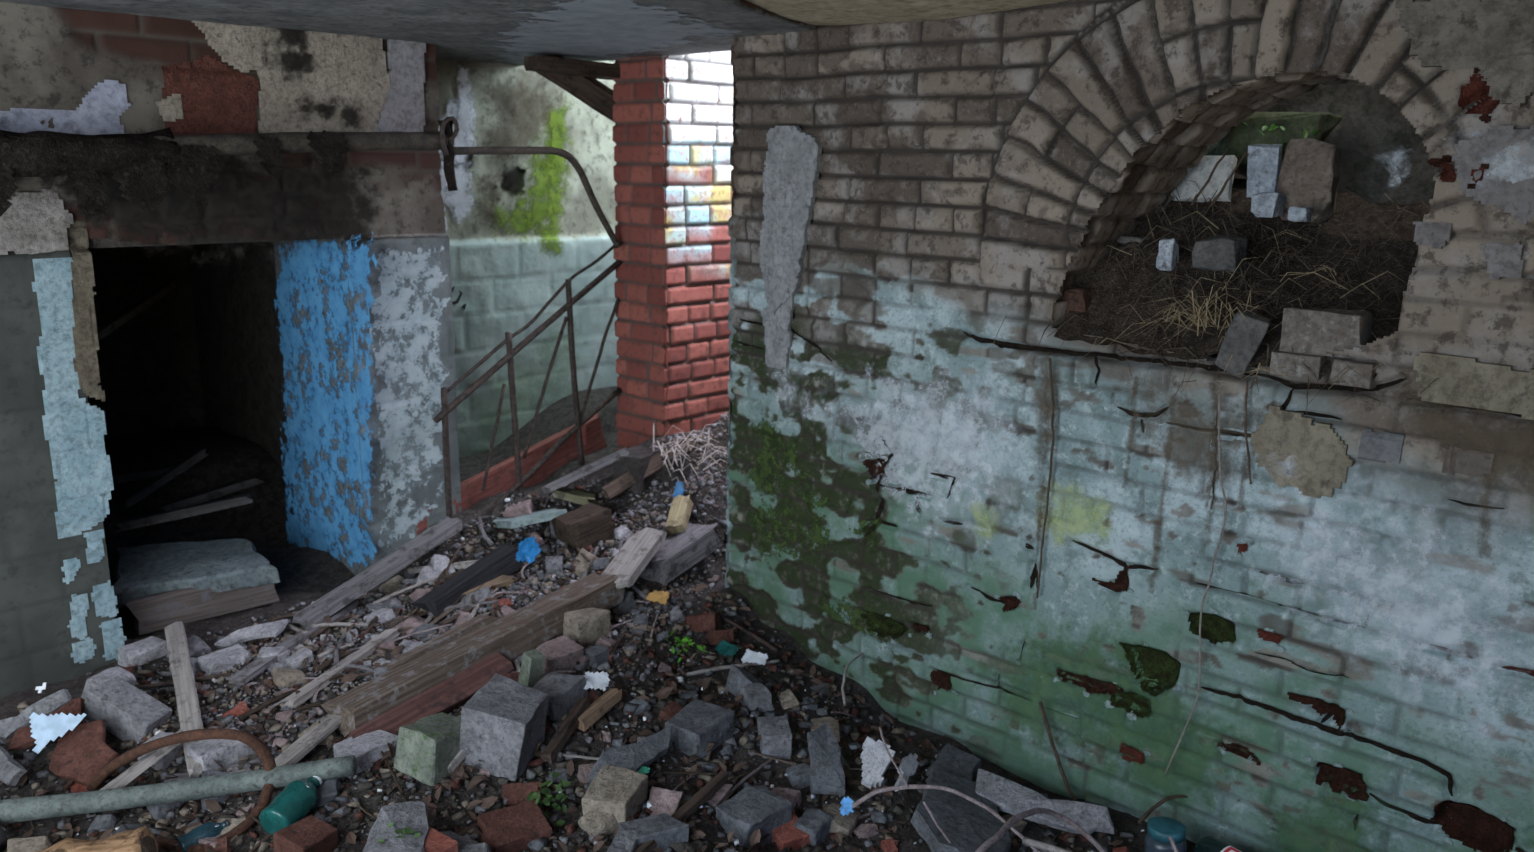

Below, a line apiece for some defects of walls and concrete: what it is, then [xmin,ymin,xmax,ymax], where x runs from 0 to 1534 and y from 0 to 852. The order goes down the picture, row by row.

spalling [155,55,259,135]
damp [542,106,568,254]
spalling [1251,192,1285,218]
peeling [274,232,451,567]
damp [852,382,991,513]
damp [1129,378,1261,514]
damp [1151,508,1162,586]
spalling [1053,641,1186,721]
crack [1255,652,1348,678]
crack [1201,687,1453,830]
spalling [1304,756,1370,802]
spalling [1430,800,1524,852]